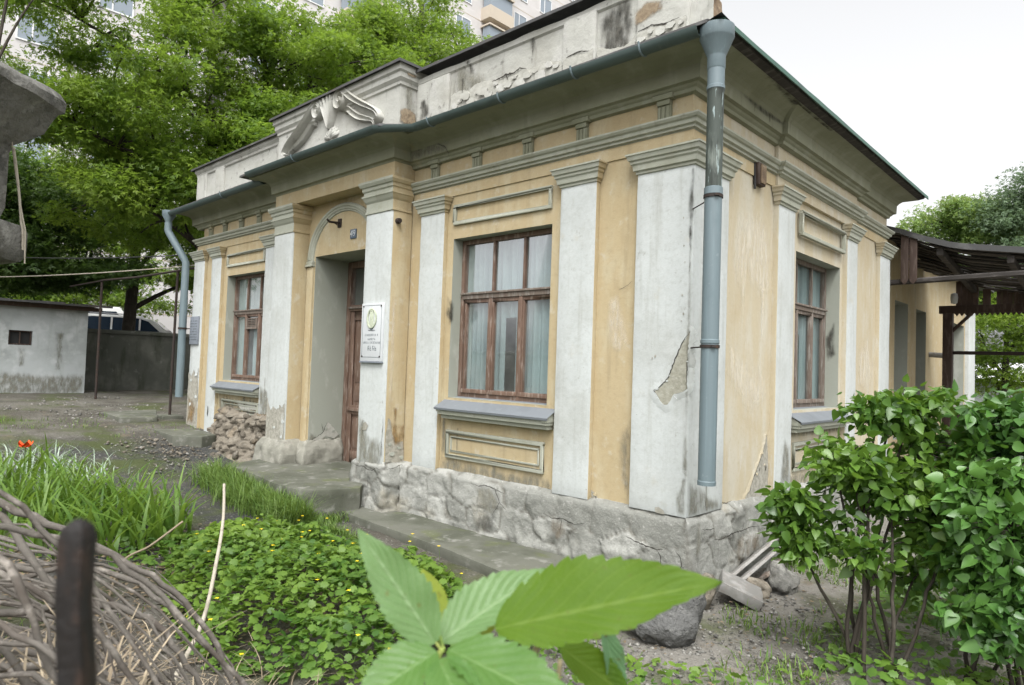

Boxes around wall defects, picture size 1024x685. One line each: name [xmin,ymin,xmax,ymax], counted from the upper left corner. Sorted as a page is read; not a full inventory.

spalling [450,1,687,110]
leakage [603,0,631,49]
flaking render [401,108,416,124]
spalling [648,313,697,413]
flaking render [186,370,285,464]
peeling [385,418,404,464]